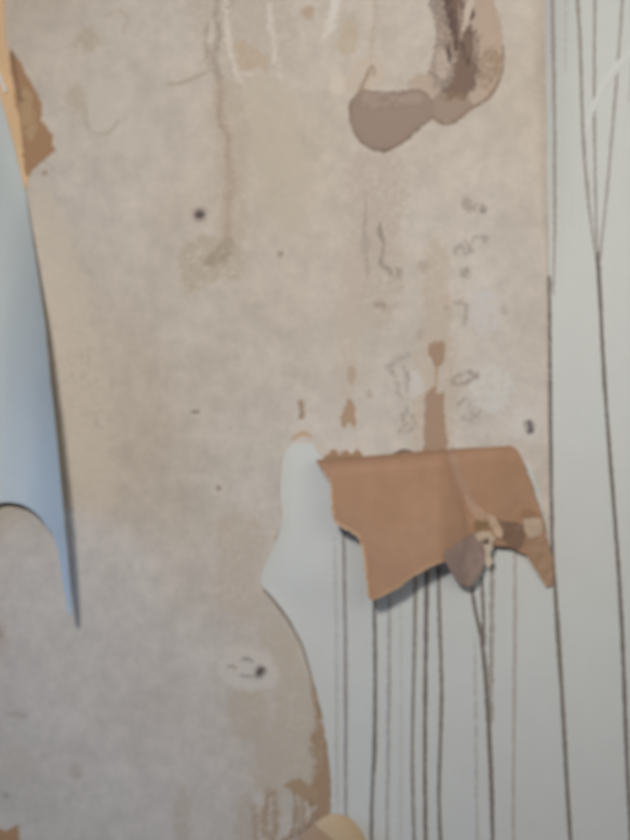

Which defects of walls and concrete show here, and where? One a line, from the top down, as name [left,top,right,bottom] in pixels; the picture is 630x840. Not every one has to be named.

leakage [406,0,506,125]
leakage [222,610,318,840]